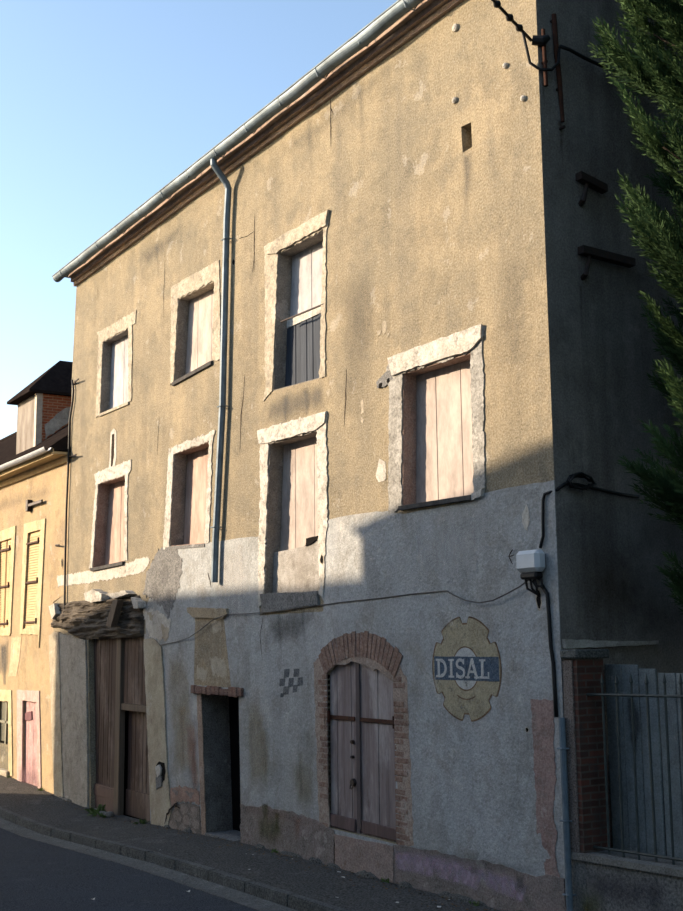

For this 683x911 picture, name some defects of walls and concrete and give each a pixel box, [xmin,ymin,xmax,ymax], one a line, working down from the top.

flaking render [57,545,183,643]
peeling [525,699,560,878]